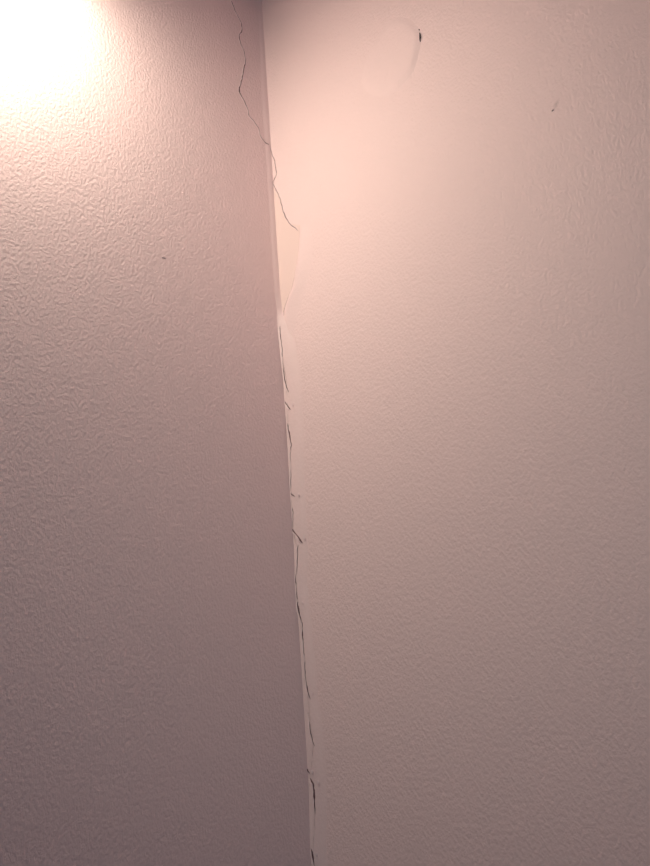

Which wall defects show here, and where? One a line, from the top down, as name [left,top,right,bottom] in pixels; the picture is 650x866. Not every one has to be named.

crack [231,2,298,231]
crack [278,326,319,866]